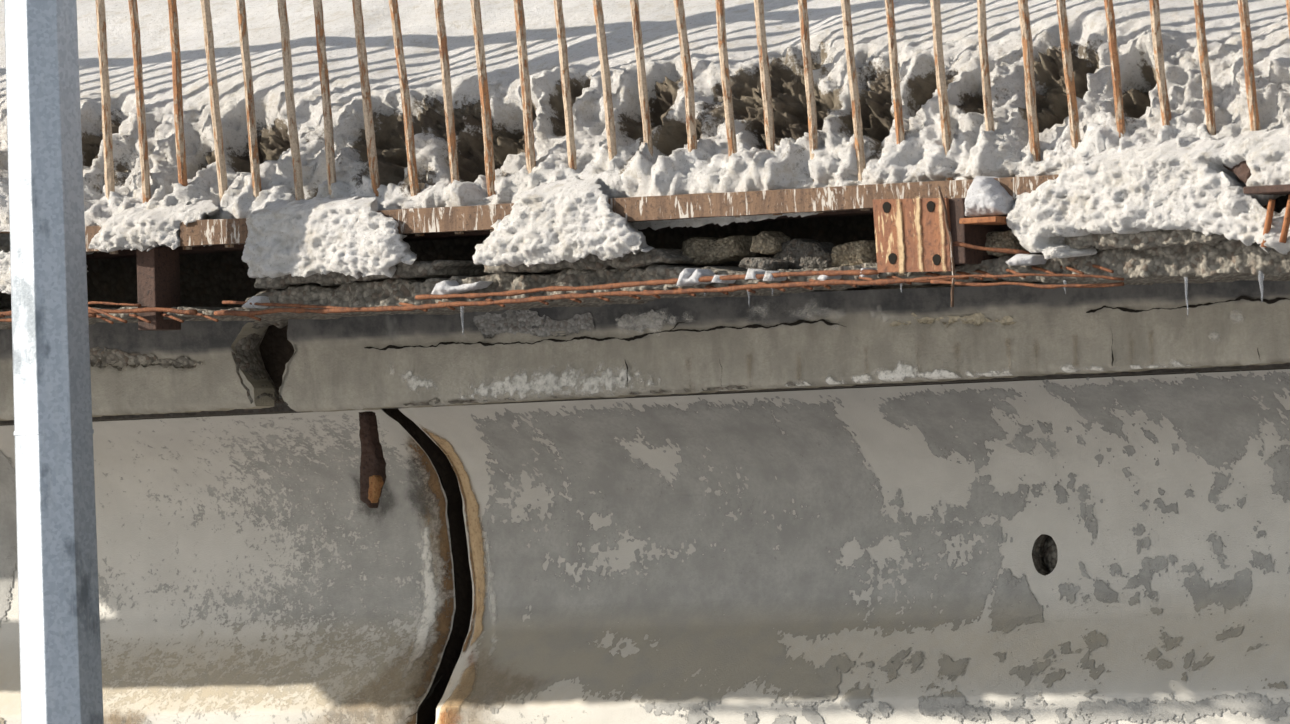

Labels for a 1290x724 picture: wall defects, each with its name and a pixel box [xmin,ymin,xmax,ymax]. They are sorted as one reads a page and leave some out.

corrosion [895,197,923,273]
spalling [1064,229,1227,250]
peeling [0,450,17,622]
peeling [404,370,1290,724]
crack [406,676,442,719]